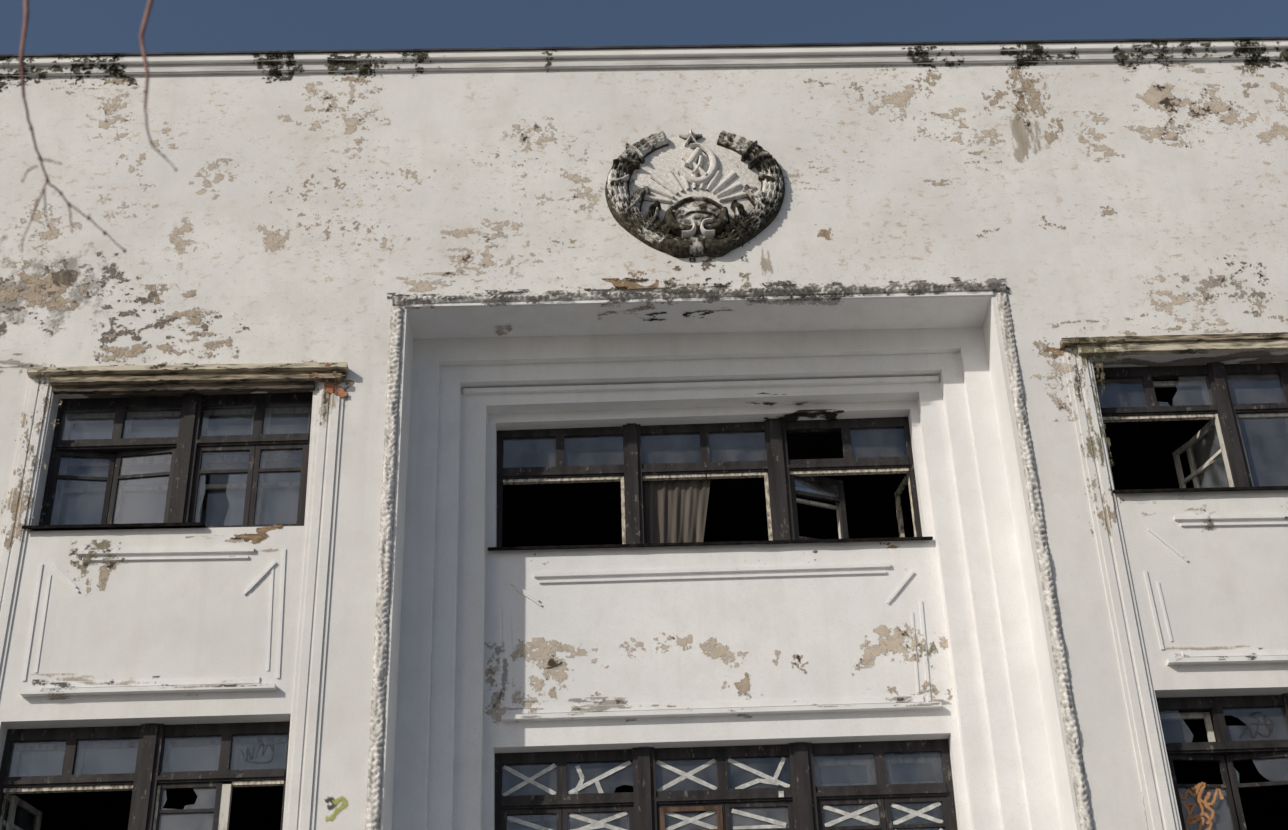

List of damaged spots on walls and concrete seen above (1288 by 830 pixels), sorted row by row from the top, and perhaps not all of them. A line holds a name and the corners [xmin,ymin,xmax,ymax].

peeling [51,77,186,218]
peeling [258,73,436,252]
peeling [396,117,616,292]
peeling [803,65,1008,171]
peeling [1051,67,1288,162]
leakage [1168,60,1288,74]
peeling [84,252,250,366]
peeling [1123,255,1288,336]
peeling [484,637,609,725]
peeling [620,633,752,700]
peeling [772,650,808,674]
peeling [851,623,952,700]